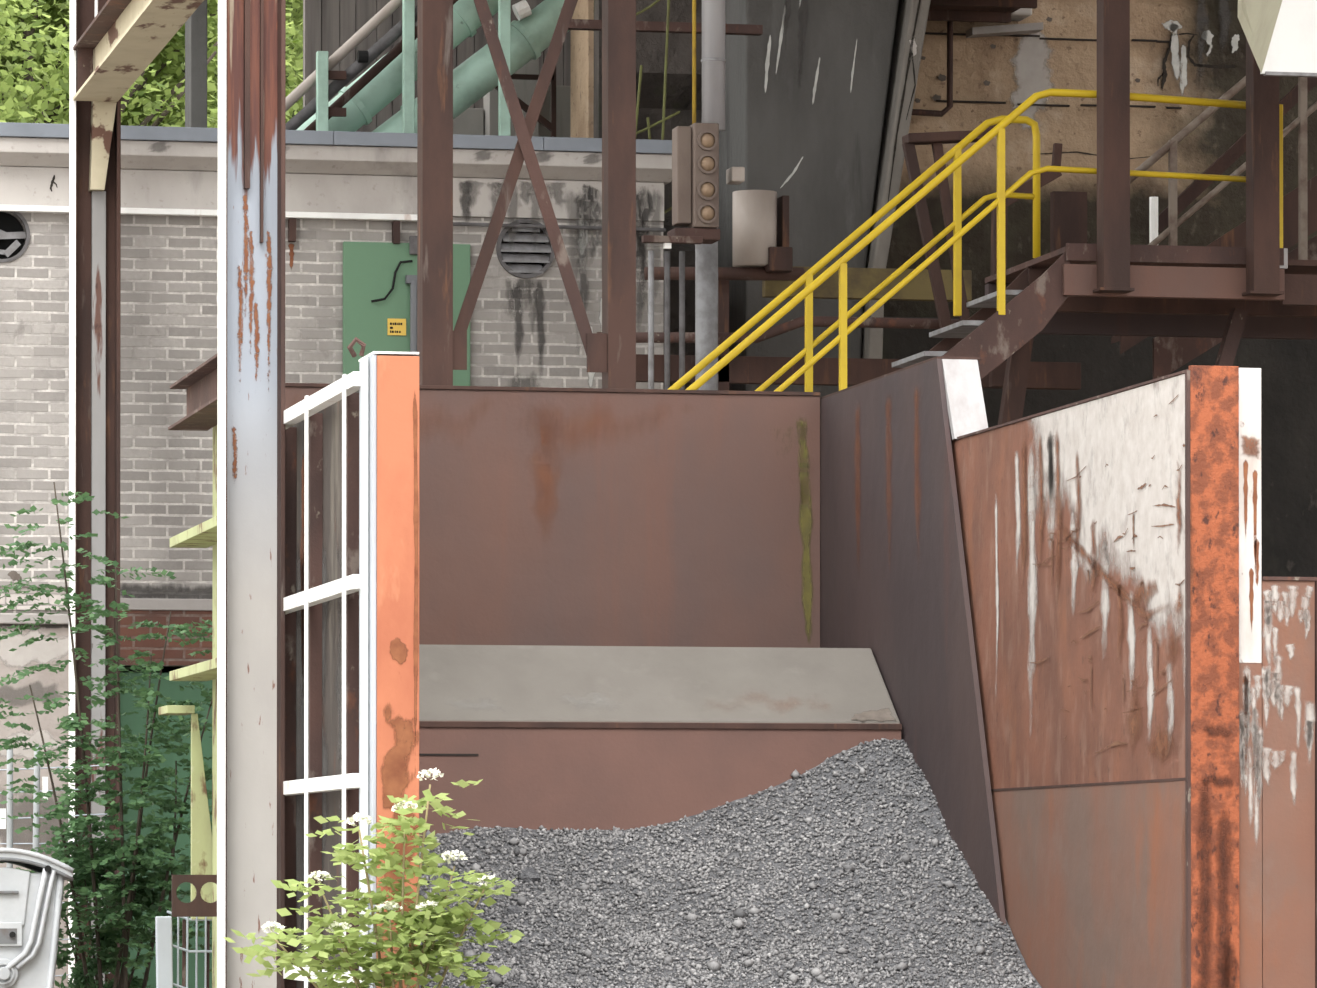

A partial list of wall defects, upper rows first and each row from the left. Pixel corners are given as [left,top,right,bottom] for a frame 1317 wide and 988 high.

corrosion [237,195,272,389]
damp [460,182,471,221]
damp [512,282,545,358]
damp [576,186,602,333]
damp [636,189,653,317]
flaking render [0,730,60,760]
flaking render [0,630,69,667]
corrosion [381,393,419,946]
peeling [1015,374,1185,739]
corrosion [1242,436,1259,629]
peeling [1239,585,1314,838]
corrosion [1199,776,1235,988]